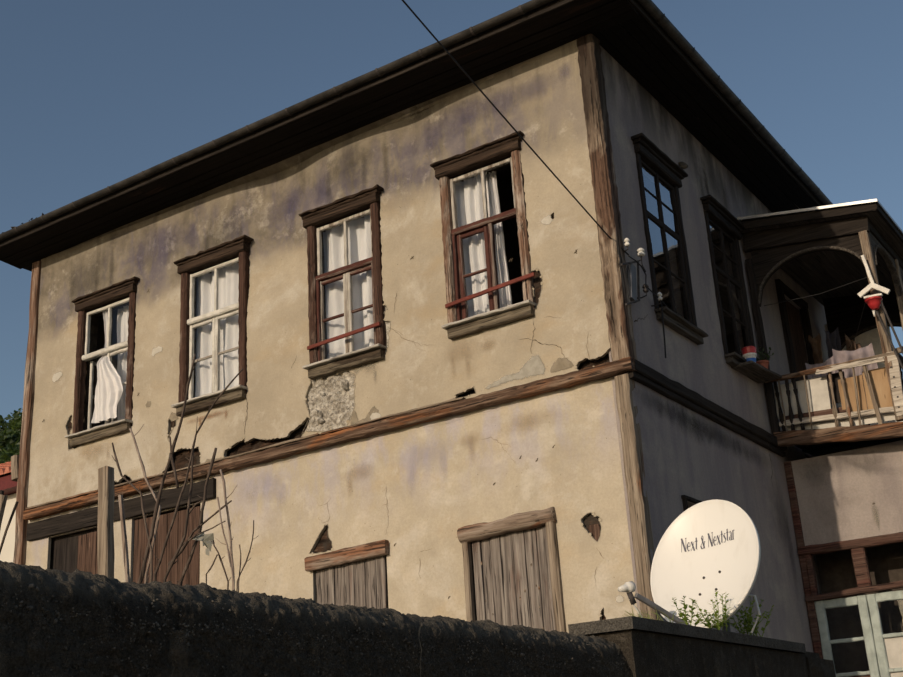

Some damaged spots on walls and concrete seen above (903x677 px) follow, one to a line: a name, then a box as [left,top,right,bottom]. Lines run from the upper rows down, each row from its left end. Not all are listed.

flaking render [574,356,610,370]
flaking render [163,370,381,471]